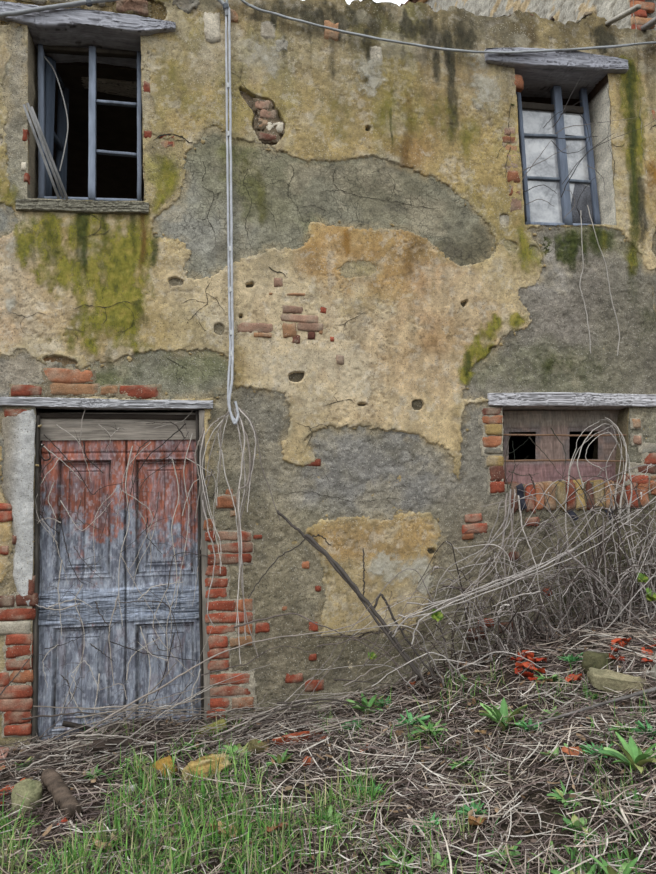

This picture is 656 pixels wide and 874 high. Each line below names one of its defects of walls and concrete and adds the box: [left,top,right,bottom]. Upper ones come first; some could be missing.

flaking render [0,20,93,238]
leakage [76,213,90,271]
crack [154,133,223,257]
flaking render [261,21,288,52]
flaking render [118,41,517,286]
crack [243,162,434,244]
leakage [401,10,500,133]
flaking render [499,127,524,227]
flaking render [511,74,524,93]
leakage [621,58,656,241]
crack [181,279,225,333]
flaking render [0,225,656,748]